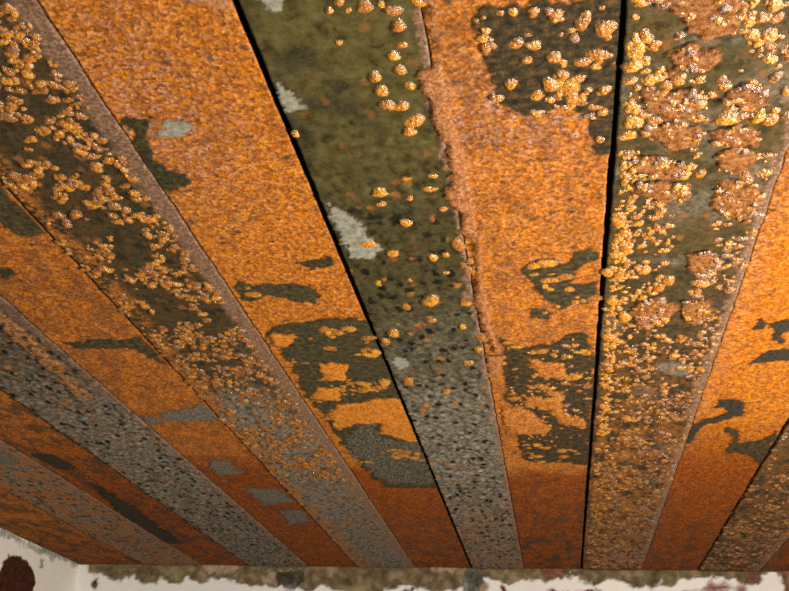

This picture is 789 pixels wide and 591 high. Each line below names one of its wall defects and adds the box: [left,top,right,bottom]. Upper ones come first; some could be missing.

rust [0,0,467,591]
rust [428,237,478,274]
rust [463,333,490,366]
rust [472,0,789,591]